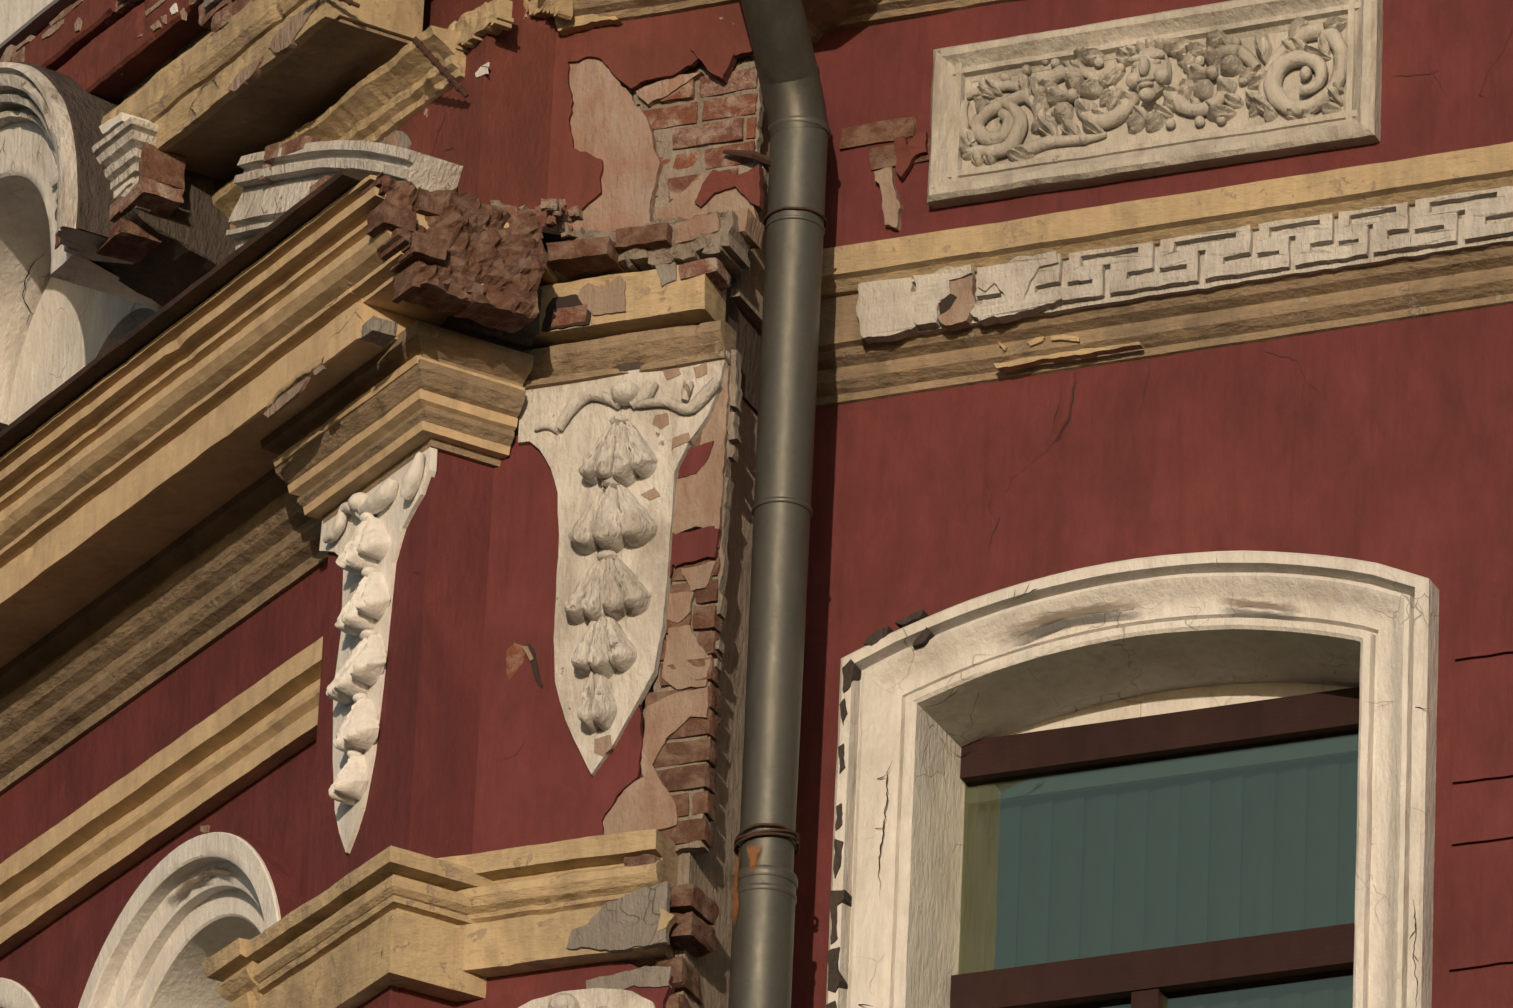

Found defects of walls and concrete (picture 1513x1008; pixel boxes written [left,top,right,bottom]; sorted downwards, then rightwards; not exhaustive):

flaking render [0,0,255,62]
spalling [448,0,623,53]
peeling [99,112,152,135]
flaking render [96,143,186,264]
spalling [569,50,768,232]
flaking render [839,117,930,231]
peeling [542,275,626,332]
spalling [856,251,1064,344]
peeling [994,334,1144,372]
spalling [603,349,743,867]
corrosion [732,846,761,919]
spalling [566,881,719,1008]